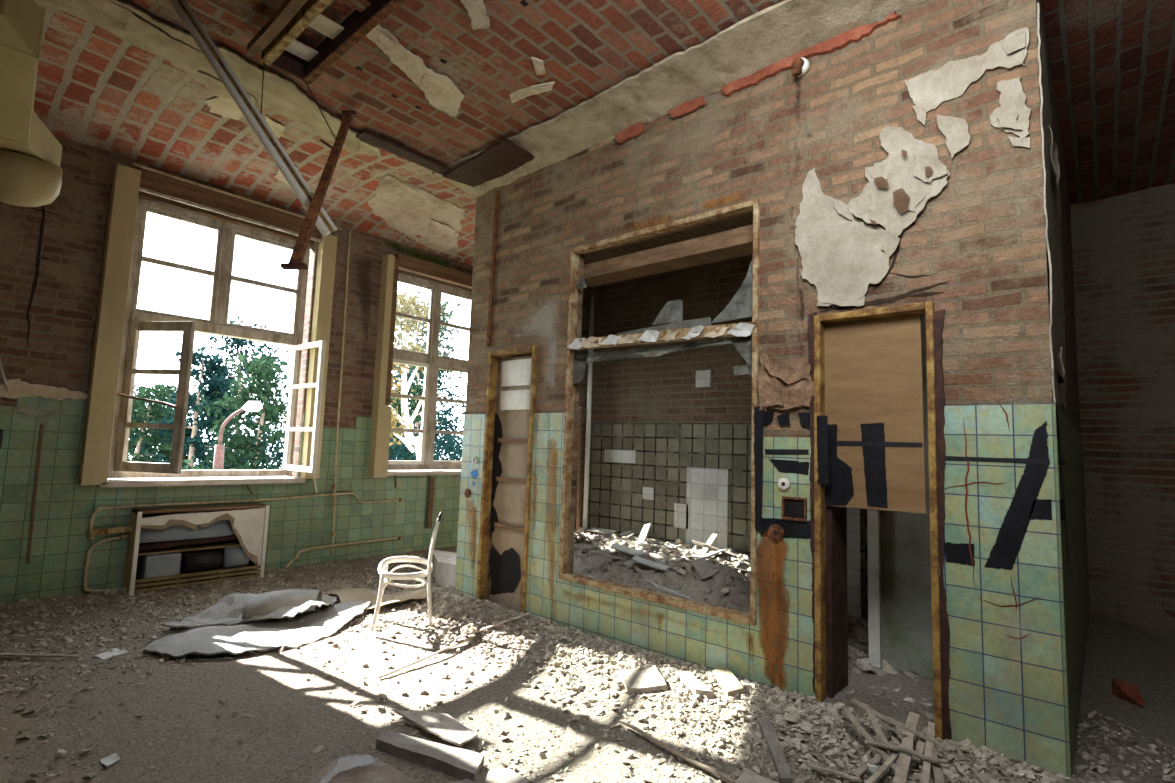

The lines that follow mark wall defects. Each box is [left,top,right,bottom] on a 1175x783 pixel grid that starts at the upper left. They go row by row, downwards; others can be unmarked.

peeling [35,0,245,120]
peeling [216,46,381,158]
peeling [365,24,465,117]
peeling [460,0,490,30]
peeling [509,57,555,103]
spalling [615,122,645,144]
spalling [667,96,707,119]
spalling [722,11,902,97]
peeling [368,174,466,258]
peeling [795,2,1067,410]
spalling [0,379,88,401]
corrosion [757,533,789,688]